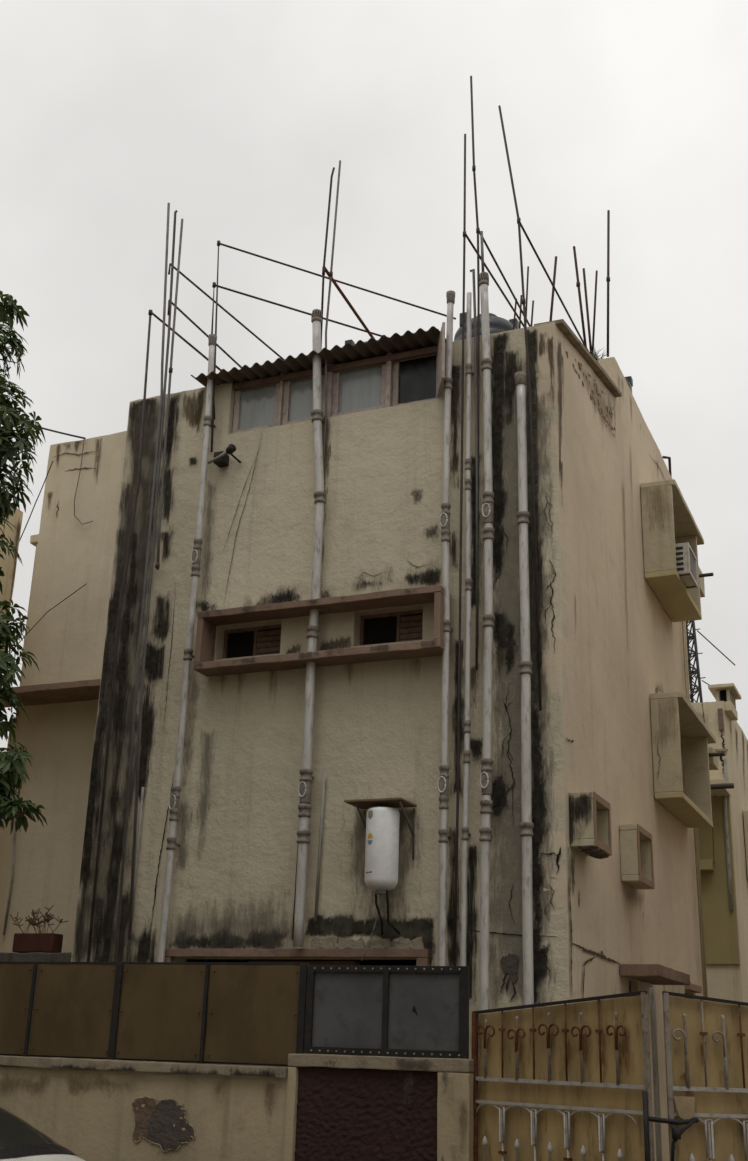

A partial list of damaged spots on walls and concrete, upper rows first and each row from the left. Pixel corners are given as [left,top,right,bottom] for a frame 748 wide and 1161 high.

peeling [566,351,615,437]
damp [322,417,331,510]
mould [243,589,328,611]
mould [405,569,440,593]
damp [426,526,456,565]
damp [75,390,204,965]
damp [452,329,564,1003]
crack [501,682,515,827]
damp [169,914,287,949]
damp [306,808,477,998]
crack [467,847,620,998]
peeling [132,1096,196,1152]